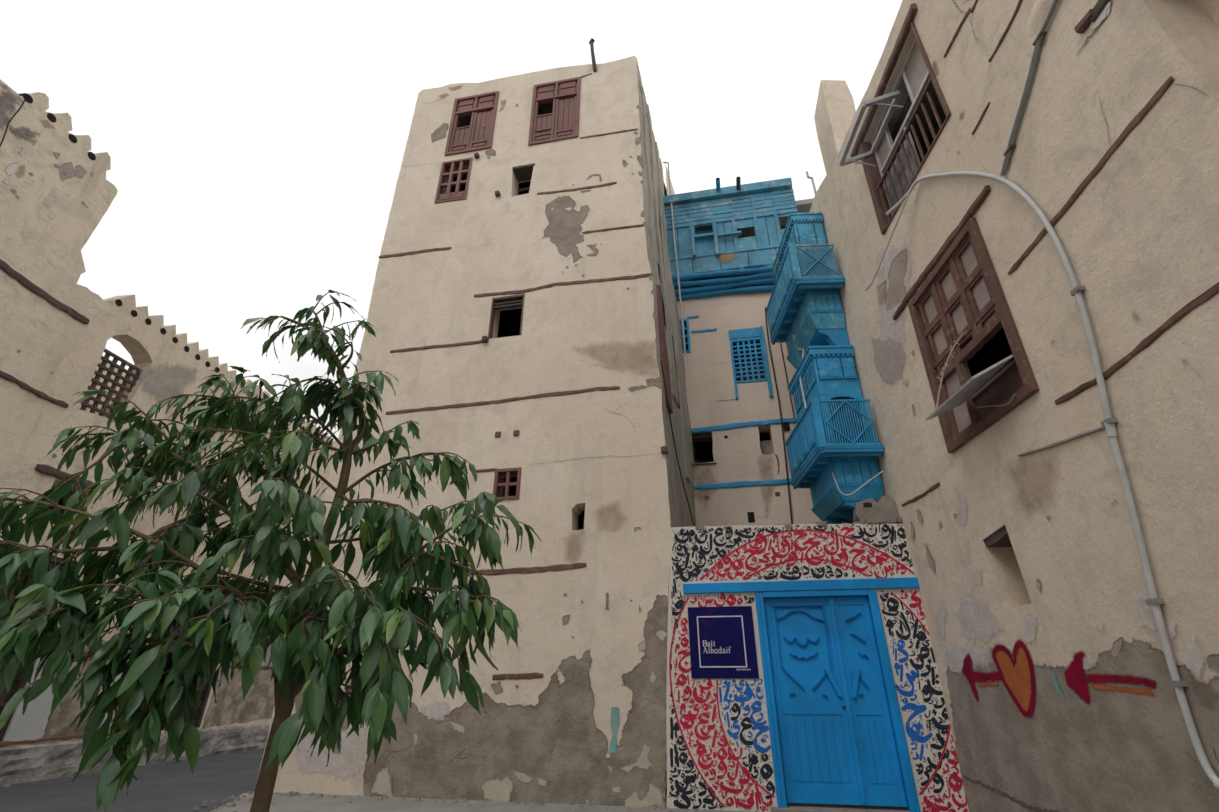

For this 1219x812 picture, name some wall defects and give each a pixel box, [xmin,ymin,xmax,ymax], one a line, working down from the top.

leakage [0,85,38,141]
spalling [543,174,602,276]
spalling [363,595,668,807]
spalling [946,634,1219,812]